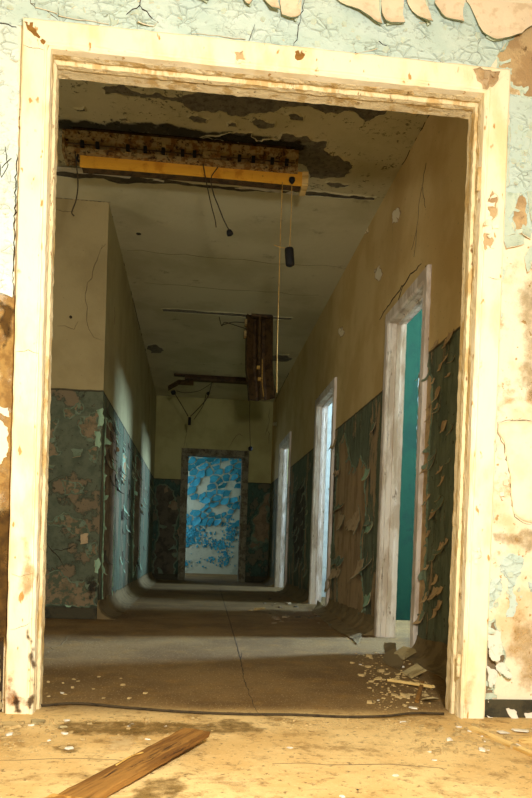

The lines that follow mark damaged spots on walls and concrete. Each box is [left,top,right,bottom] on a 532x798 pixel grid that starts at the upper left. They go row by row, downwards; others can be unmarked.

crack [0,147,18,295]
peeling [0,0,532,298]
crack [379,165,426,320]
peeling [0,407,9,464]
water stain [0,294,16,645]
peeling [45,408,154,608]
peeling [185,456,241,568]
peeling [288,463,311,578]
peeling [324,433,373,614]
peeling [485,553,532,703]
peeling [506,708,532,719]